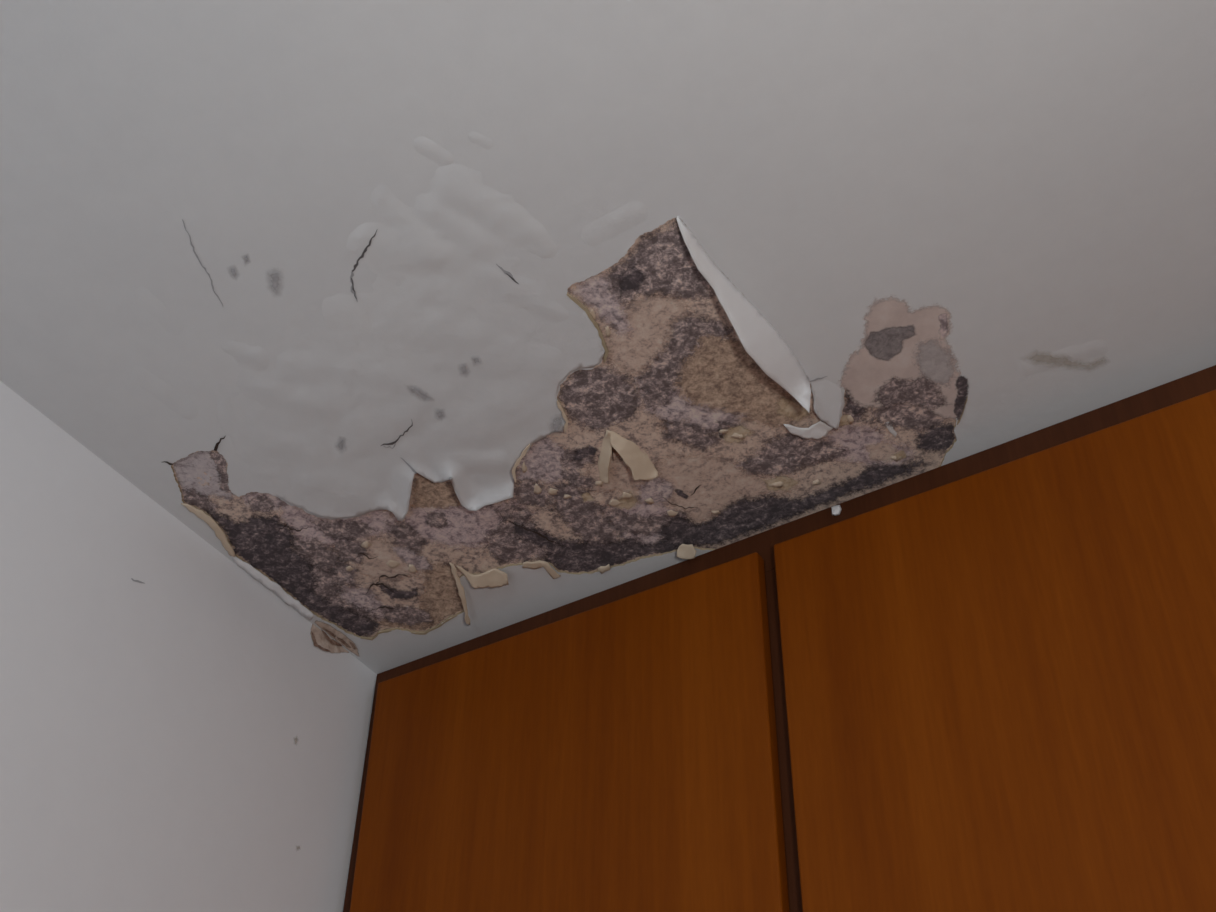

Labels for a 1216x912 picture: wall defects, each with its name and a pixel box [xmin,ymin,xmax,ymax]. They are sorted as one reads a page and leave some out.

crack [182,219,223,306]
crack [350,230,377,302]
peeling [172,216,969,656]